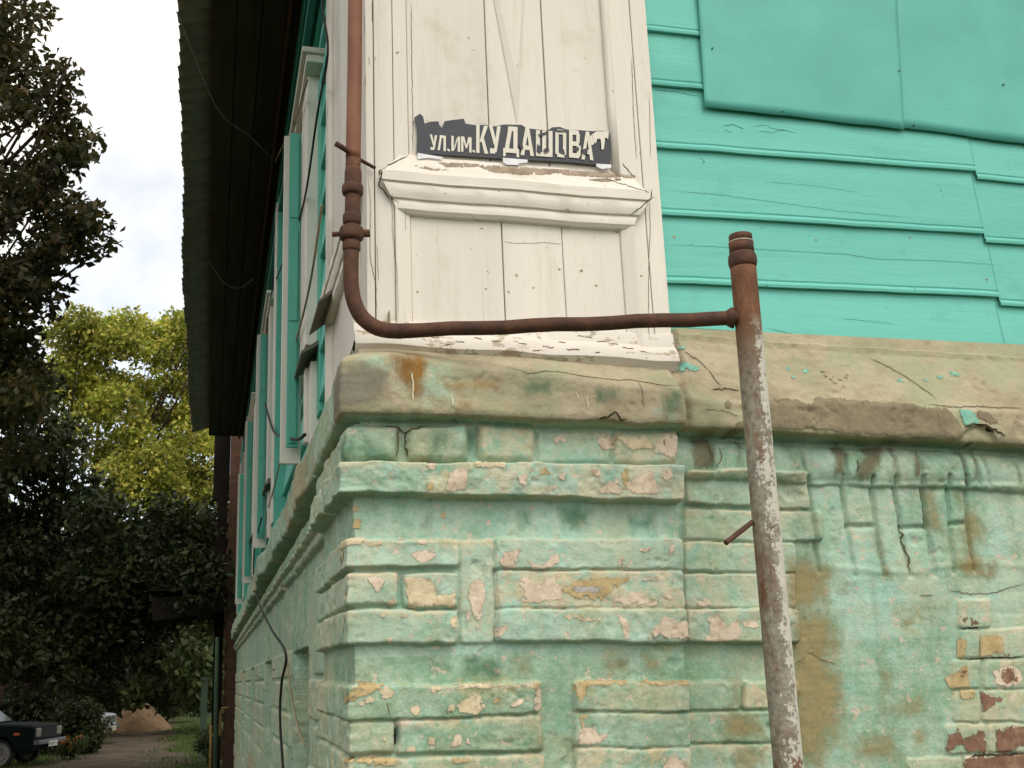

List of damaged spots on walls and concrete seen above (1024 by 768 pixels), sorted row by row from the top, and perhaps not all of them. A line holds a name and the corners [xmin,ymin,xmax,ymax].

crack [870,358,1015,436]
crack [385,426,428,458]
peeling [427,461,507,493]
peeling [593,432,678,494]
crack [892,486,930,572]
peeling [499,547,673,640]
peeling [648,616,689,640]
peeling [698,597,759,644]
peeling [343,680,394,706]
peeling [431,663,542,715]
peeling [945,615,1023,712]
flaking render [945,726,1024,768]